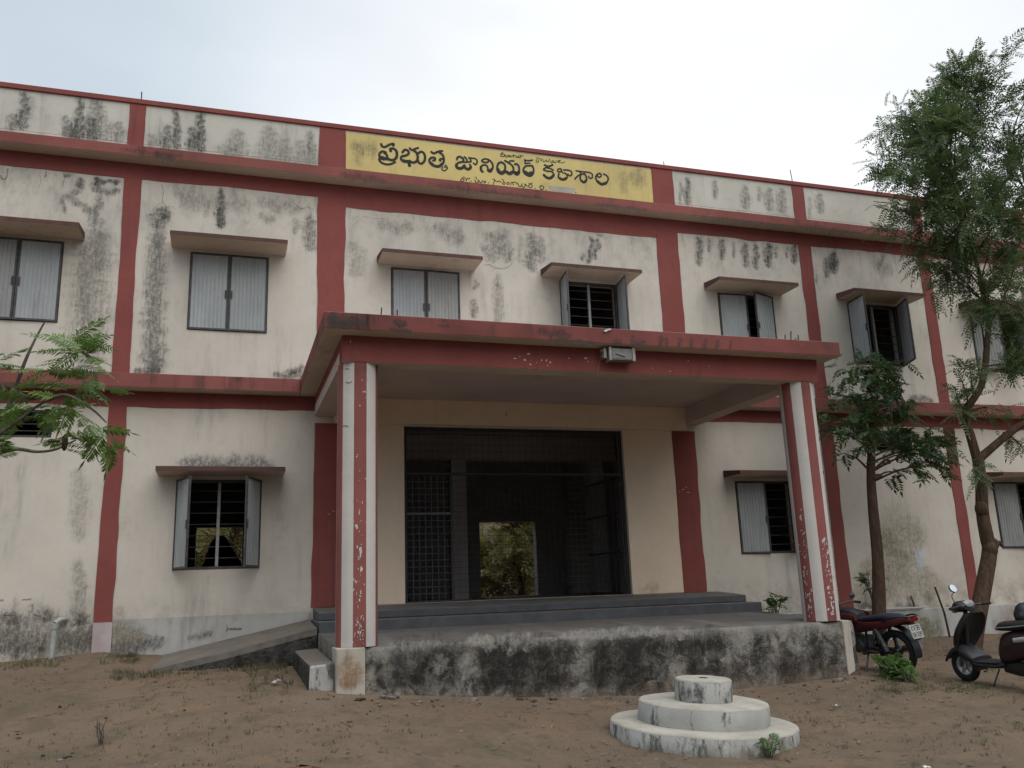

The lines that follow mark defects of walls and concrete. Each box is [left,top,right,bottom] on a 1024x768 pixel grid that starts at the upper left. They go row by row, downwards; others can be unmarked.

water stain [63,99,98,140]
water stain [156,110,205,161]
water stain [60,179,118,224]
water stain [135,208,167,374]
water stain [390,626,667,691]